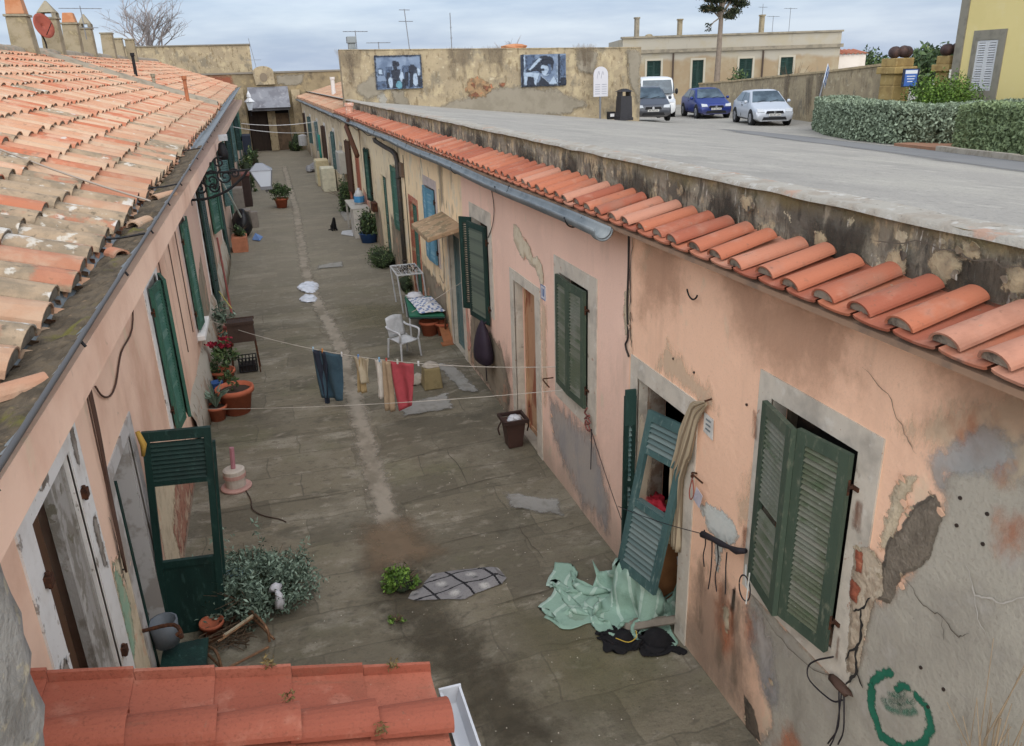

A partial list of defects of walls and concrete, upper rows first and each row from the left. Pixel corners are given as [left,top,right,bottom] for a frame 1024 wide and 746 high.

spalling [465,76,505,99]
peeling [512,224,544,285]
peeling [70,426,80,464]
crack [866,370,913,449]
peeling [700,502,739,572]
peeling [93,511,151,668]
peeling [743,425,1024,746]
crack [908,566,1024,639]